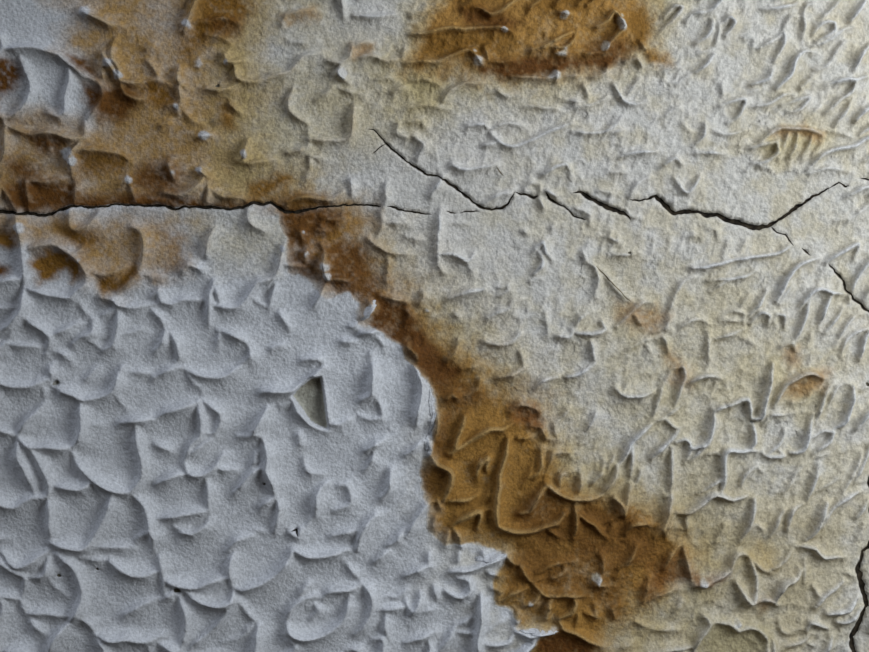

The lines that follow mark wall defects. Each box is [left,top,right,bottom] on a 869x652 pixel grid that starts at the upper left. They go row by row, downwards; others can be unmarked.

leakage [256,0,396,82]
crack [0,129,869,312]
crack [849,542,869,652]